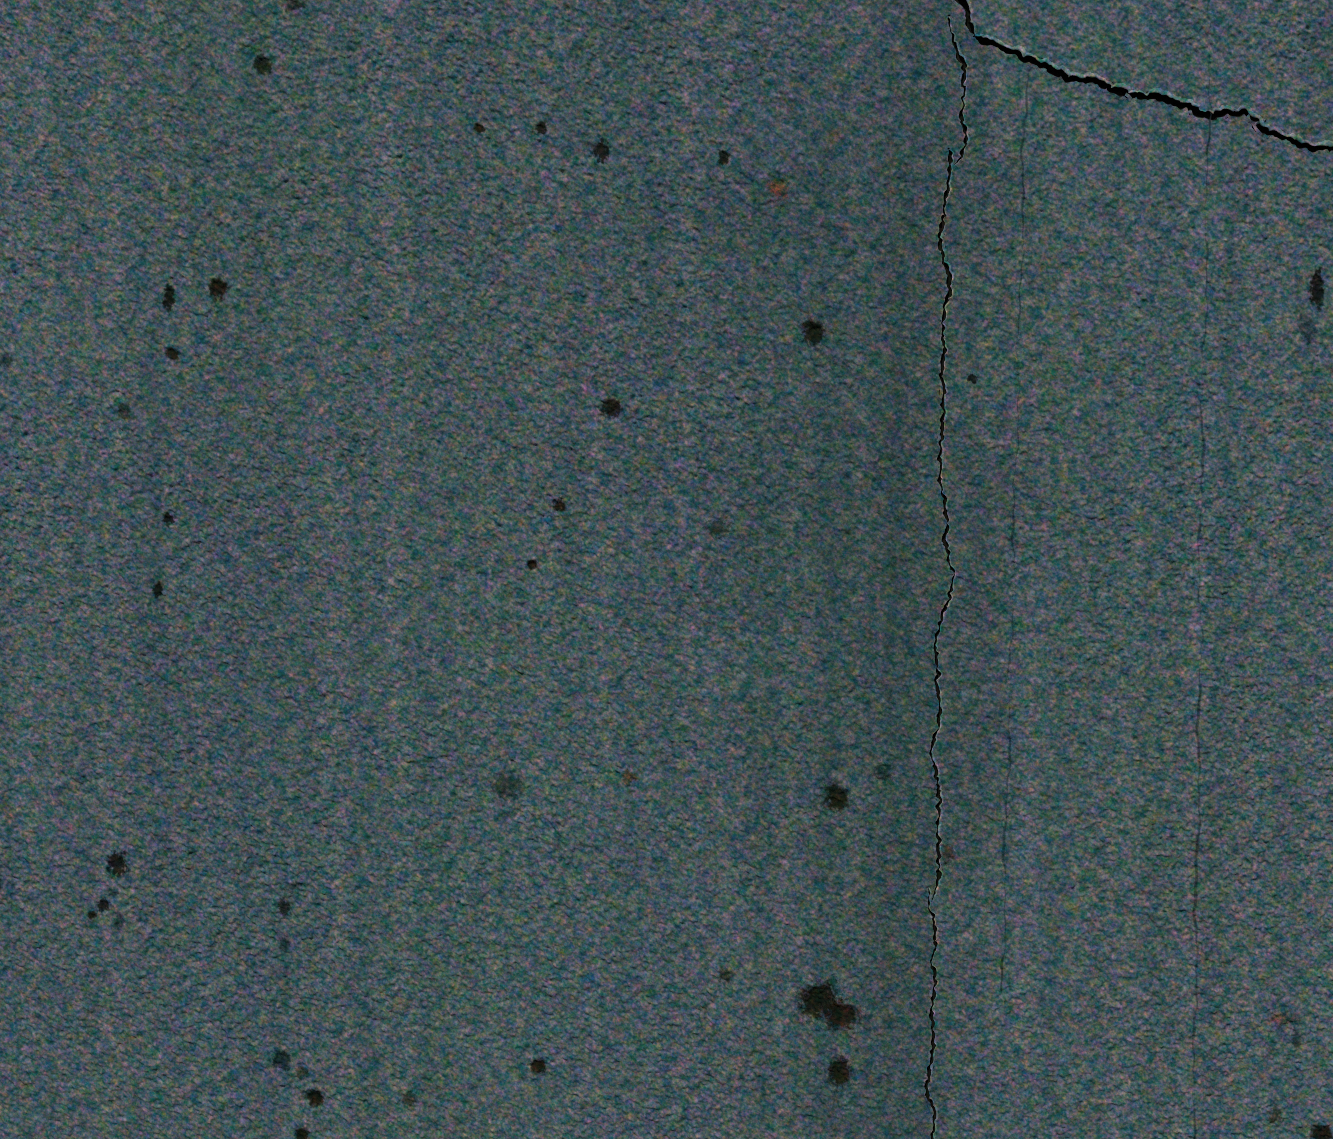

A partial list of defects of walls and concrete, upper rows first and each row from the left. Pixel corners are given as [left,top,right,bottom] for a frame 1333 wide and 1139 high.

crack [921,0,1333,1139]